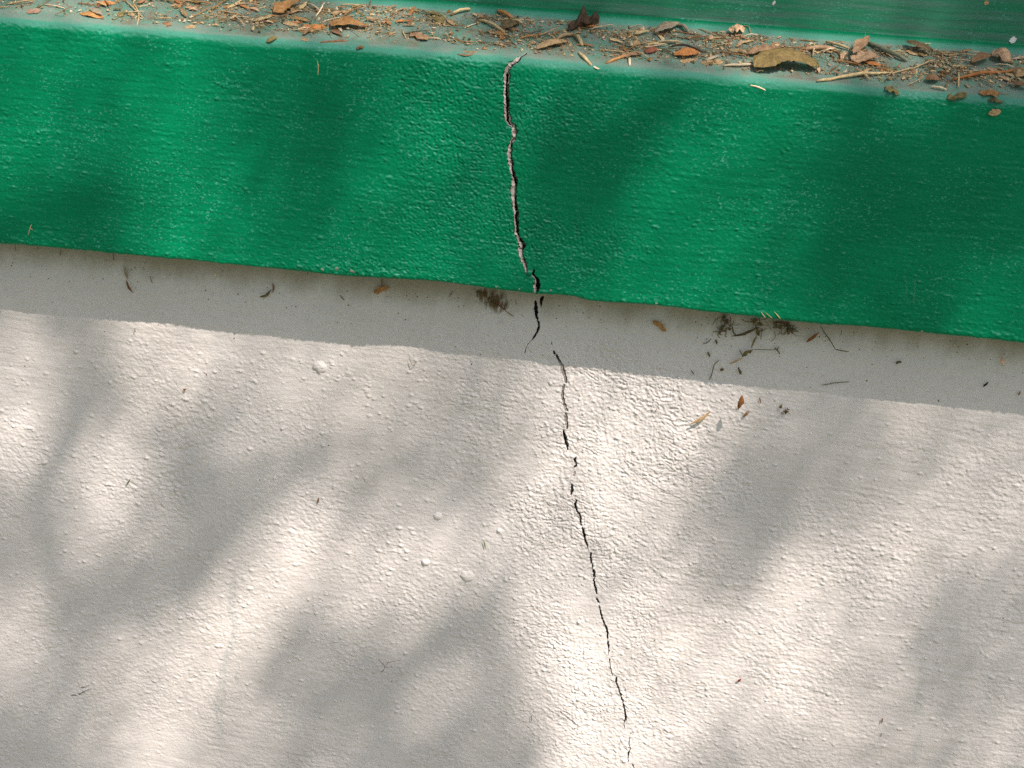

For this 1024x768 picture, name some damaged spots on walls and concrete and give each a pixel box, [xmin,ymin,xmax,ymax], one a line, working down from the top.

crack [503,52,634,767]